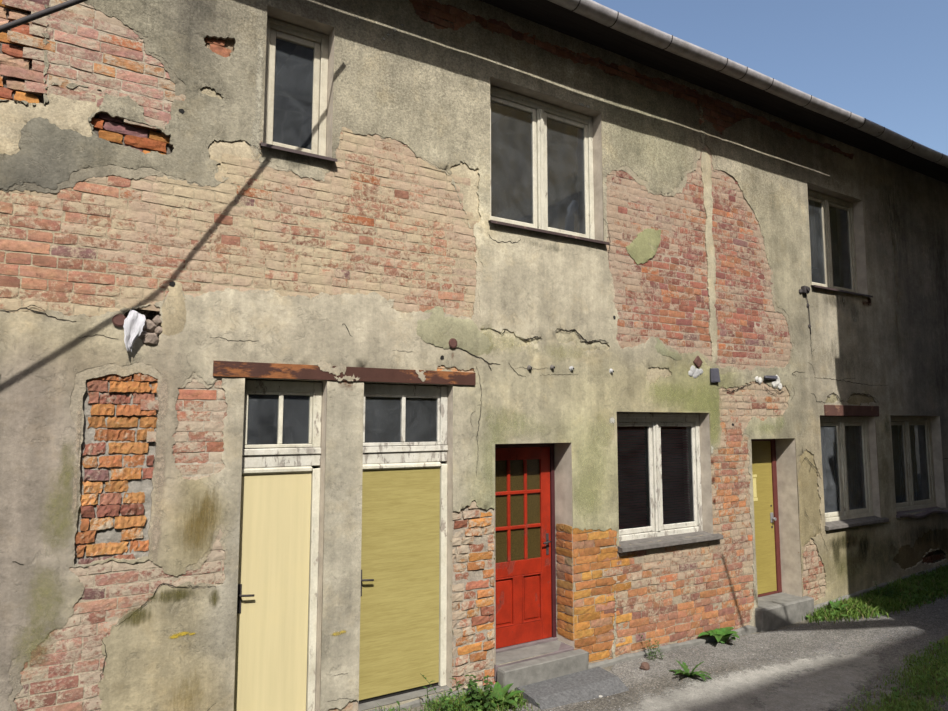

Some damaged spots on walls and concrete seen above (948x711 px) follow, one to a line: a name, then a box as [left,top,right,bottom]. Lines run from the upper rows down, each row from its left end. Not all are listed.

peeling [0,0,186,155]
spalling [204,37,235,57]
peeling [409,0,854,159]
peeling [0,127,540,356]
peeling [317,360,360,381]
peeling [415,365,474,382]
crack [460,348,577,477]
crack [494,328,609,343]
peeling [556,144,794,664]
spalling [7,362,228,711]
spalling [439,500,496,691]
peeling [797,450,827,601]